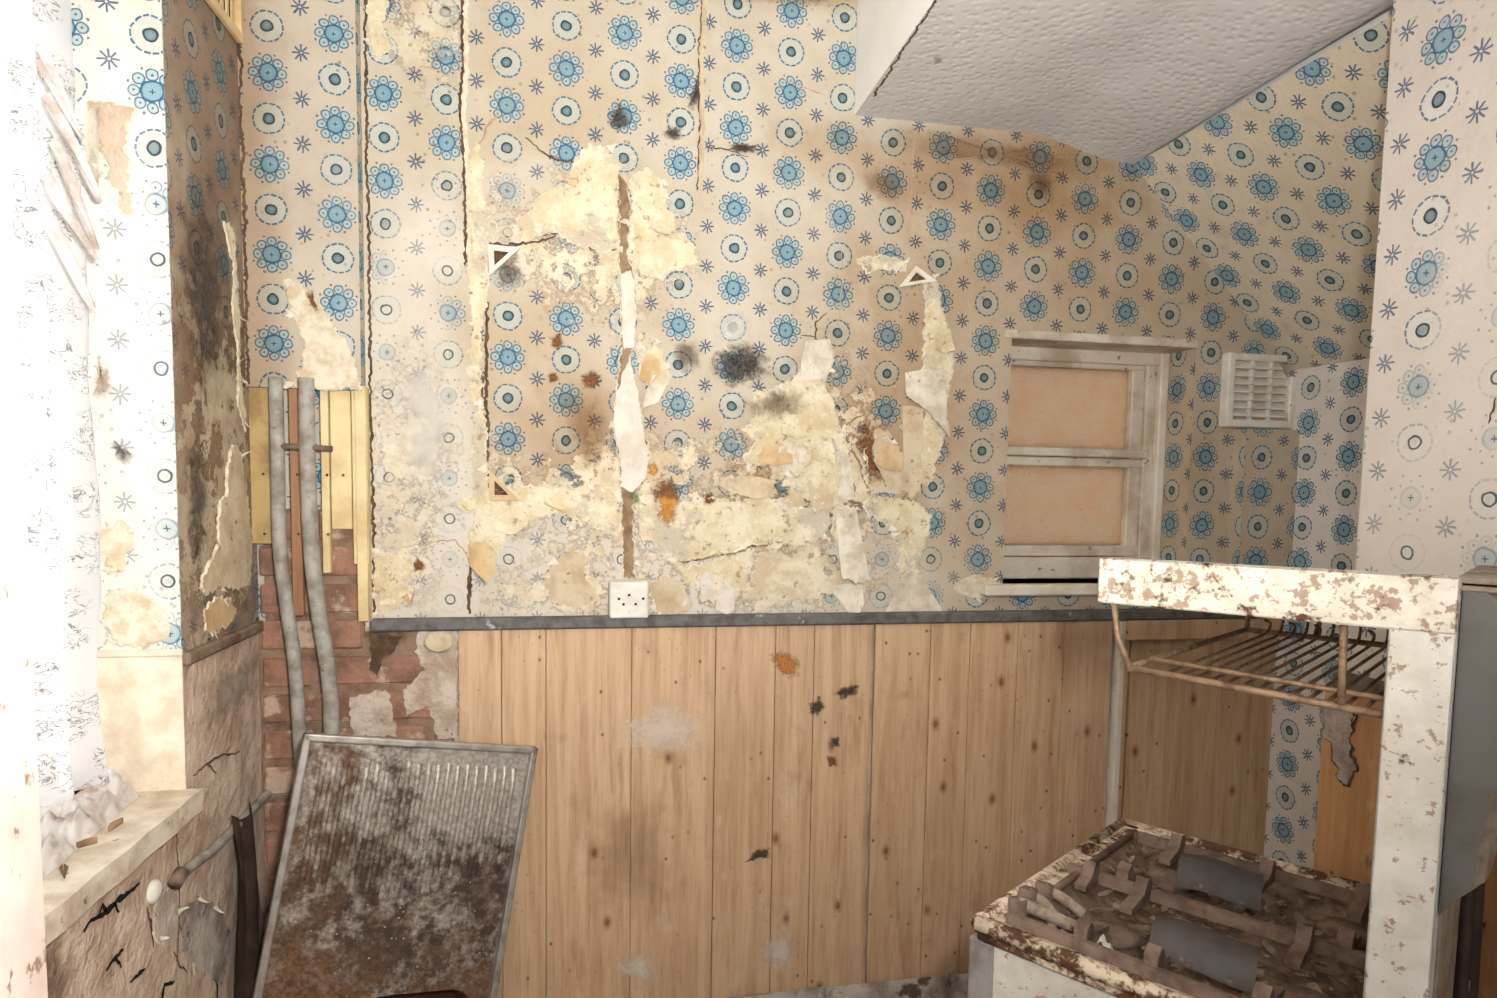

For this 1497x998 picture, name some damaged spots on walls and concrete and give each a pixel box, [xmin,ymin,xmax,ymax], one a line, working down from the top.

leakage [610,105,628,127]
mould [192,221,220,365]
leakage [715,347,764,387]
leakage [190,459,206,554]
peeling [775,424,879,518]
flaking render [199,444,459,907]
crack [193,751,240,776]
crack [83,834,218,998]
flaking render [152,887,231,985]